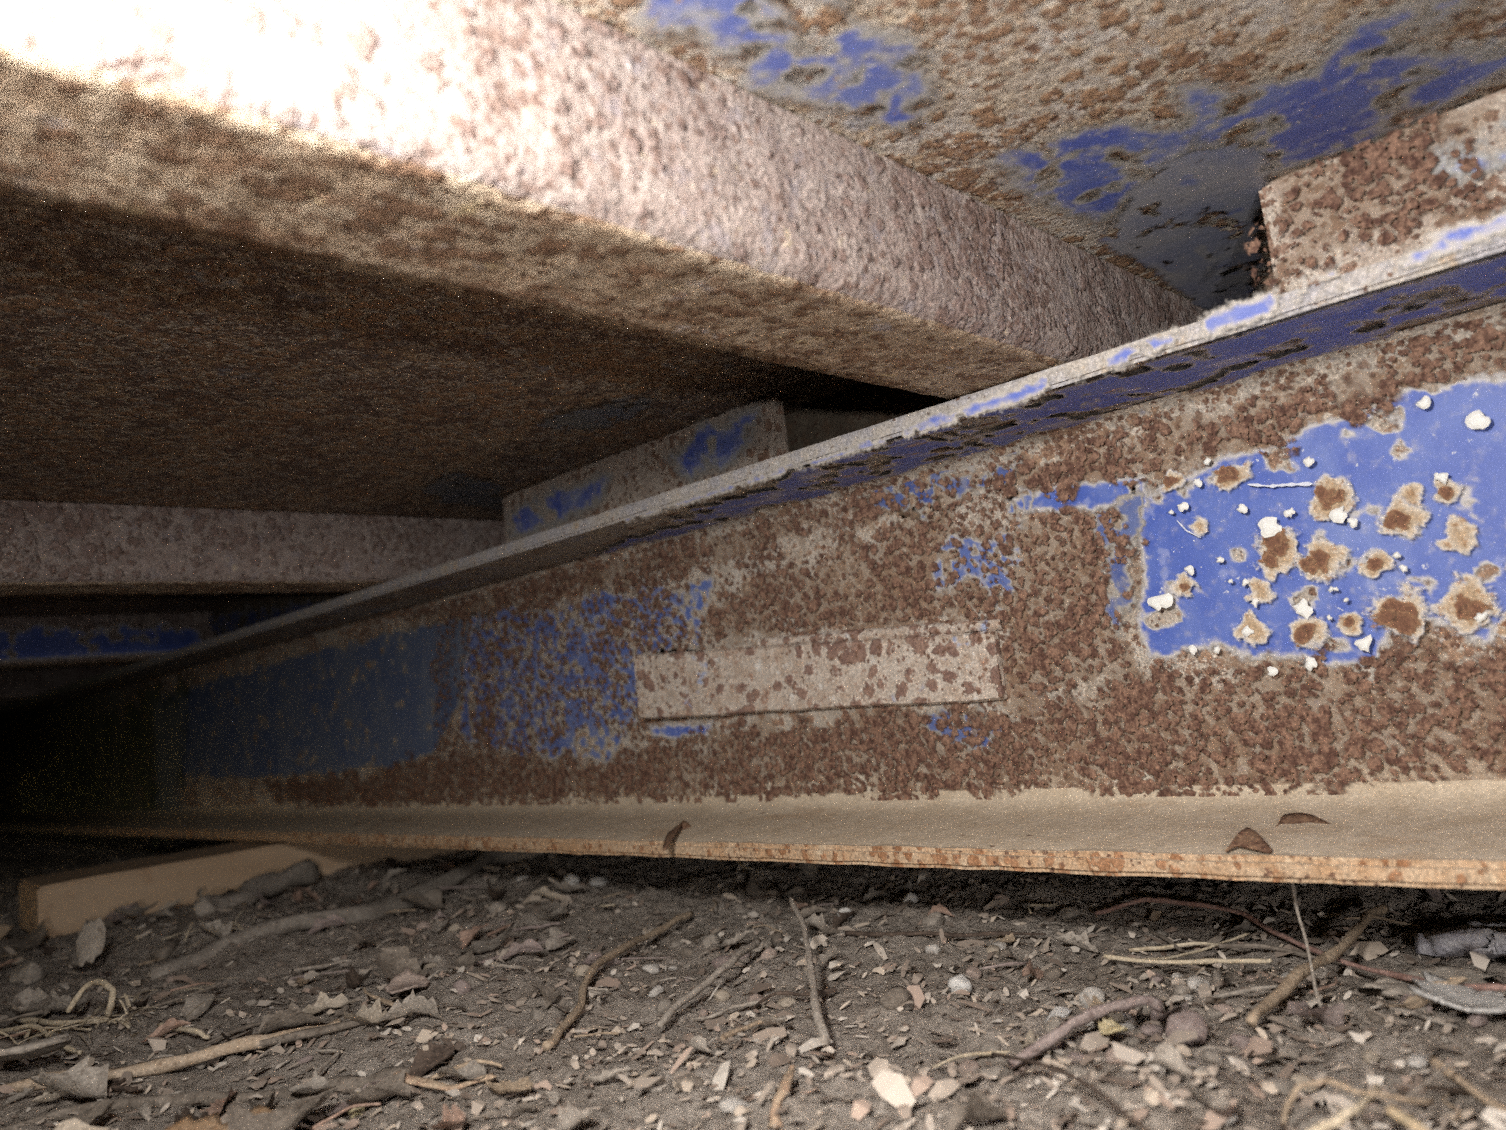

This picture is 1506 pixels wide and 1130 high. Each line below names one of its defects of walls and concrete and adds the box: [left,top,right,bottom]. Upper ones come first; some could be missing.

corrosion [1245,110,1502,294]
peeling [587,0,1506,676]
peeling [0,597,324,662]
peeling [162,575,714,782]
peeling [505,472,612,538]
corrosion [264,312,1506,809]
corrosion [663,821,691,851]
corrosion [1225,813,1331,853]